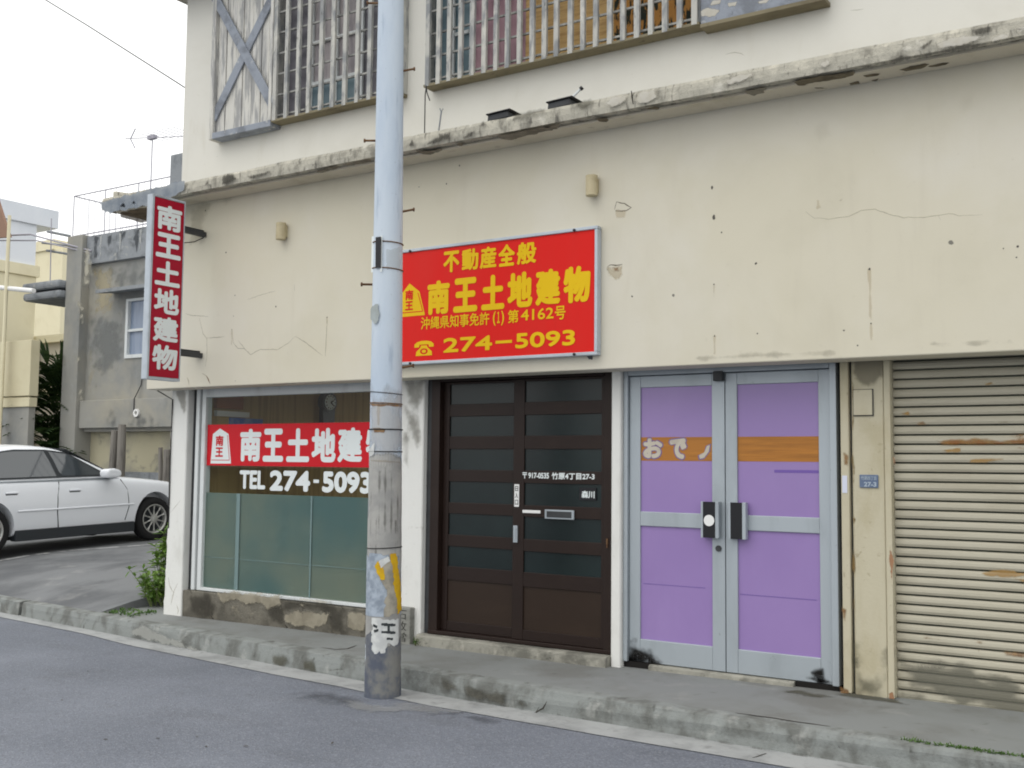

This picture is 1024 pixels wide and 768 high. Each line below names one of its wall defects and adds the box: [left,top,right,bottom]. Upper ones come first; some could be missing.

peeling [937,27,1024,48]
peeling [726,73,767,96]
spalling [794,60,879,89]
spalling [900,63,948,71]
rust [942,435,1024,452]
rust [983,570,1024,581]
peeling [217,591,330,629]